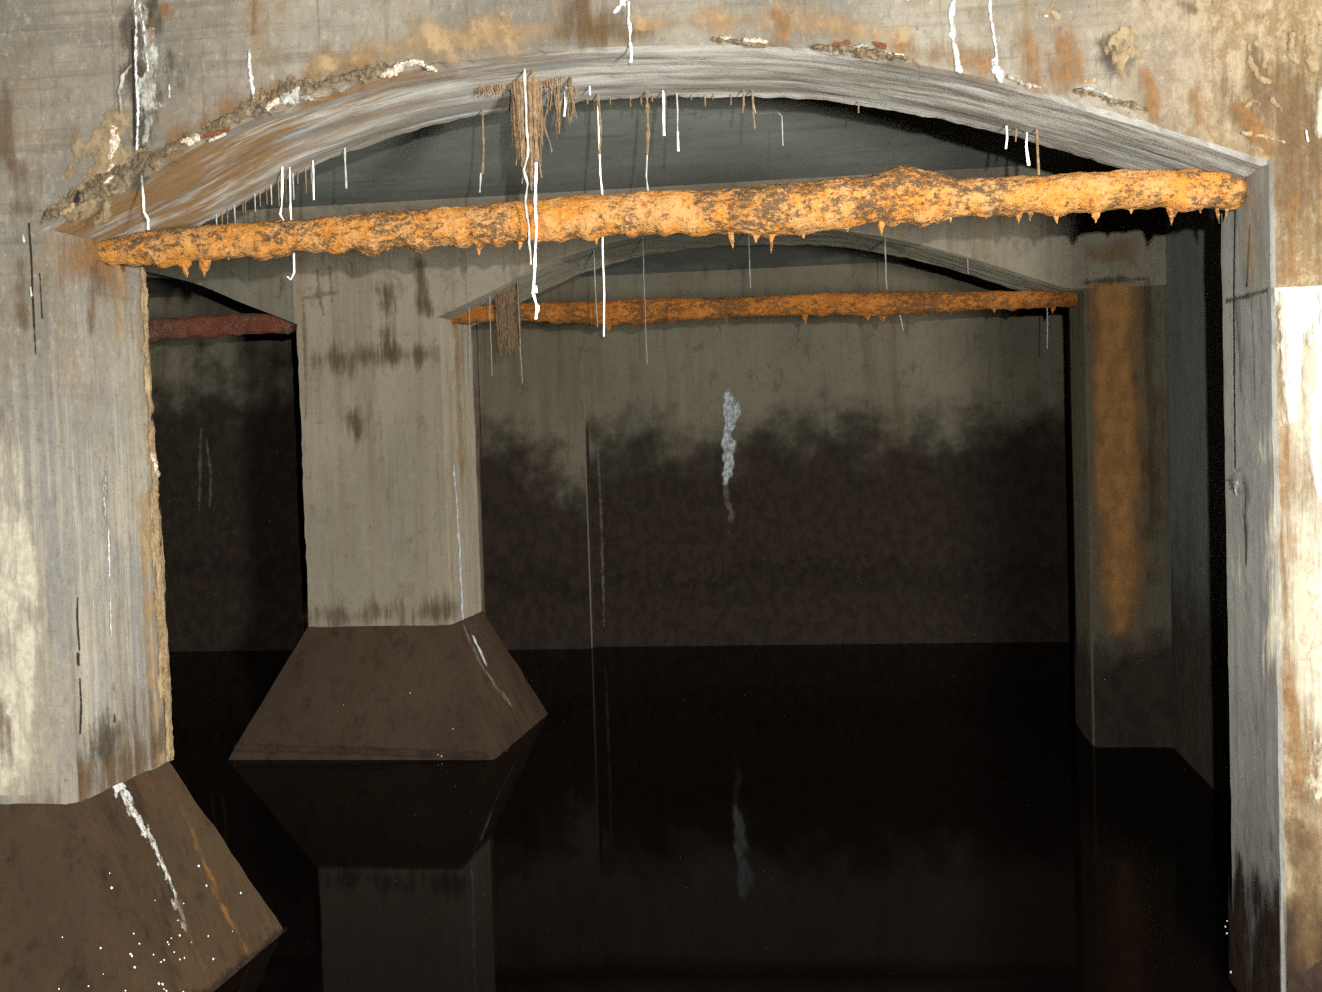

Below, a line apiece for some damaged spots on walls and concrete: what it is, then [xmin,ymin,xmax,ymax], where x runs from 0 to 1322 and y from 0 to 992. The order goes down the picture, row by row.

corrosion [177,259,211,277]
water stain [418,261,430,314]
corrosion [751,234,776,253]
corrosion [1166,207,1178,225]
water stain [1252,49,1322,226]
water stain [480,387,1231,807]
corrosion [1085,276,1155,637]
water stain [1226,286,1322,780]
water stain [79,717,192,942]